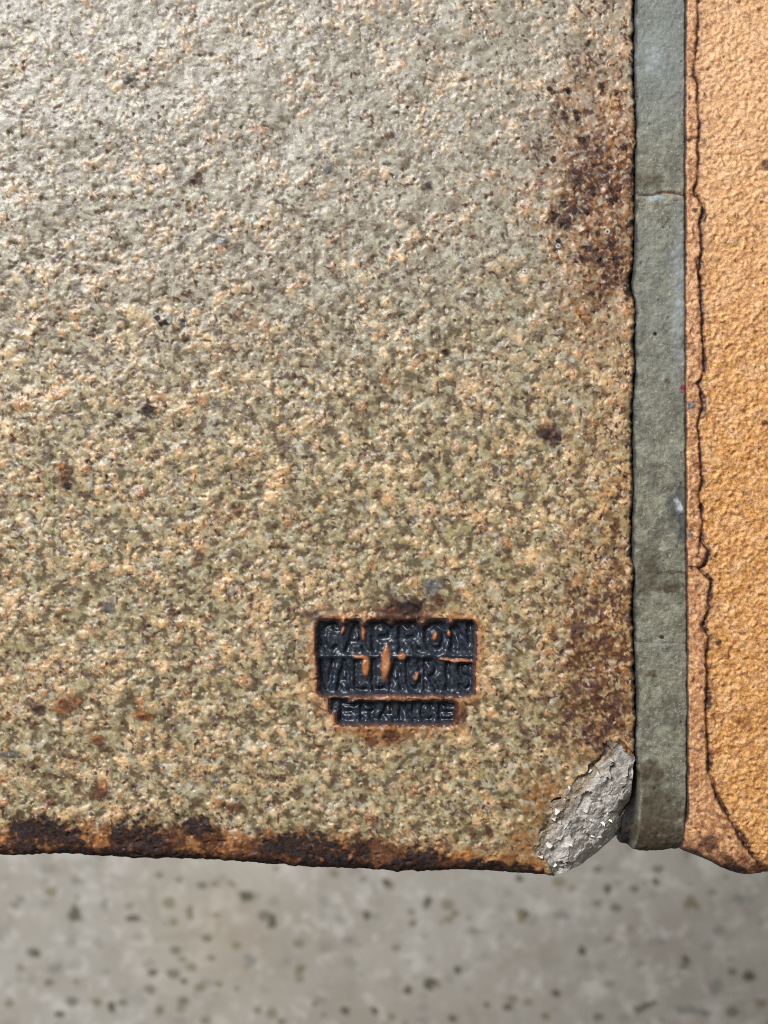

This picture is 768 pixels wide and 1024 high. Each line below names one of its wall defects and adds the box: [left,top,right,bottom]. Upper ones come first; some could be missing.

rust [547,39,635,310]
crack [635,184,764,872]
rust [548,581,630,752]
spalling [534,740,636,876]